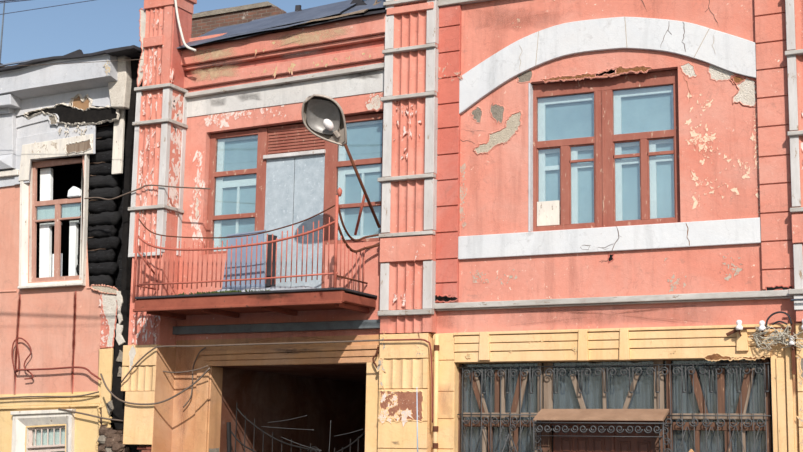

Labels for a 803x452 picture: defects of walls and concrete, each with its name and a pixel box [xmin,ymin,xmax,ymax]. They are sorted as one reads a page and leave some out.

flaking render [517,64,653,84]
spalling [23,8,183,247]
flaking render [470,102,523,156]
flaking render [679,62,760,217]
peeling [188,149,206,247]
peeling [460,162,468,230]
flaking render [91,284,118,348]
peeling [128,312,161,373]
flaking render [376,331,424,427]
flaking render [703,352,767,361]
flaking render [795,356,803,387]